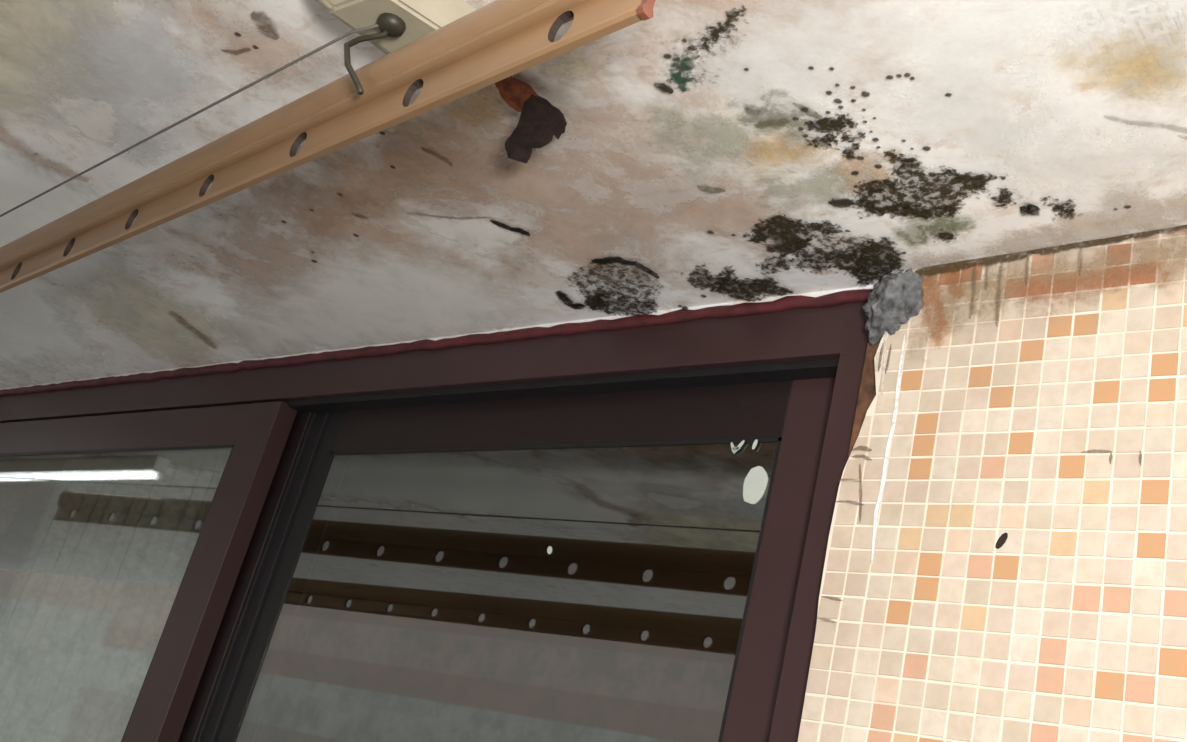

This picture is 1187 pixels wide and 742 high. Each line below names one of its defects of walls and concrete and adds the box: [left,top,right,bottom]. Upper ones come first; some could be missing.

damp [654,6,749,94]
peeling [213,76,781,358]
damp [667,67,1187,328]
damp [94,276,217,366]
damp [556,257,662,317]